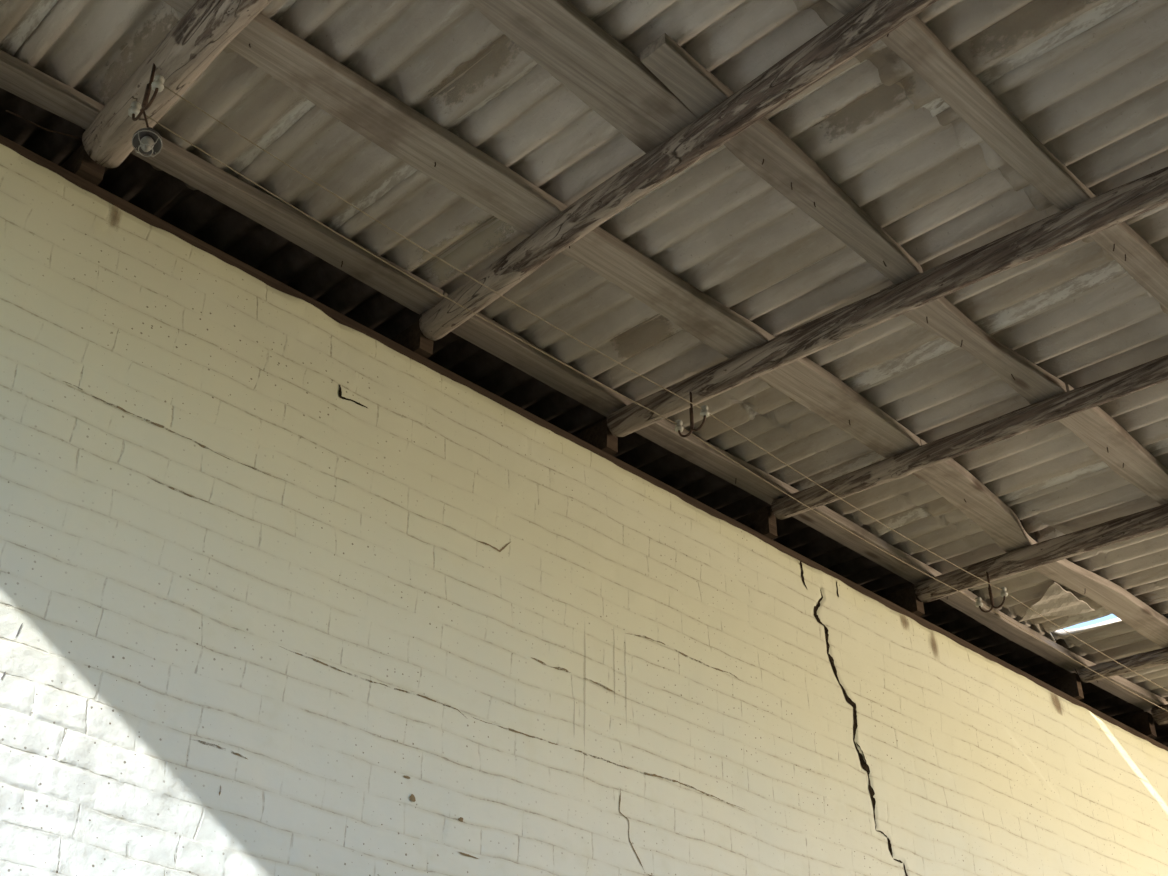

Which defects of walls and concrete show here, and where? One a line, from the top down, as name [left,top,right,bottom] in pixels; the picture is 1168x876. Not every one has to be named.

crack [199,740,247,759]
crack [280,646,743,876]
crack [800,561,908,876]